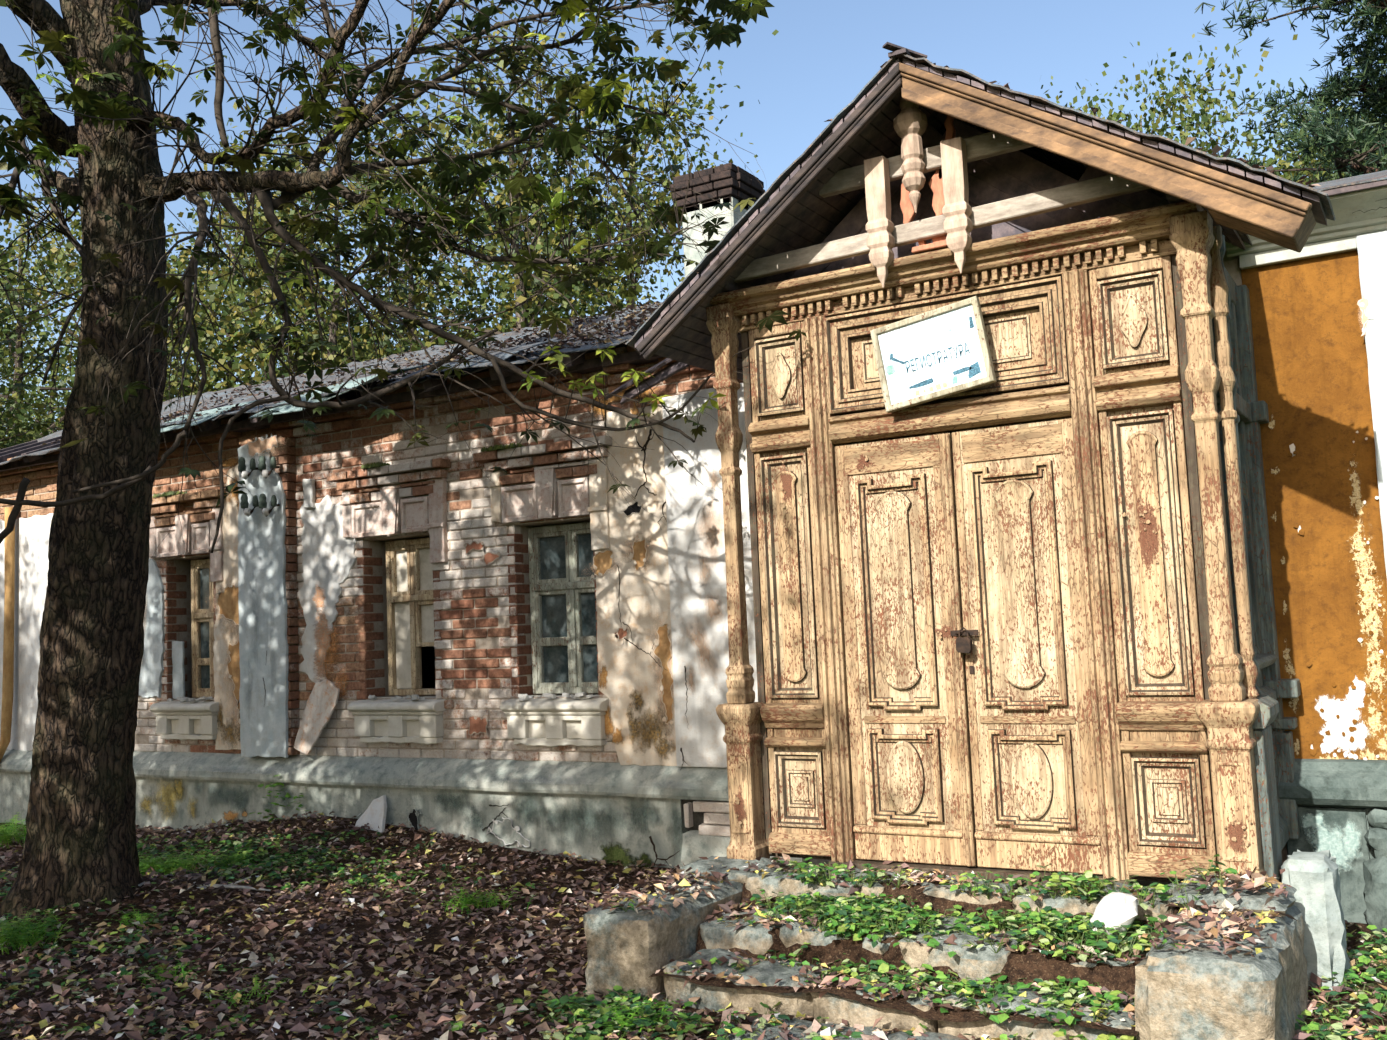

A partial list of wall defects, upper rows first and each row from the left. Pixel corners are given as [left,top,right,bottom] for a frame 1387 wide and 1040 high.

spalling [622,499,642,517]
spalling [591,534,649,578]
peeling [1293,431,1387,760]
spalling [217,583,240,724]
spalling [611,626,629,641]
spalling [650,623,674,725]
peeling [1283,640,1312,679]
crack [482,804,514,831]